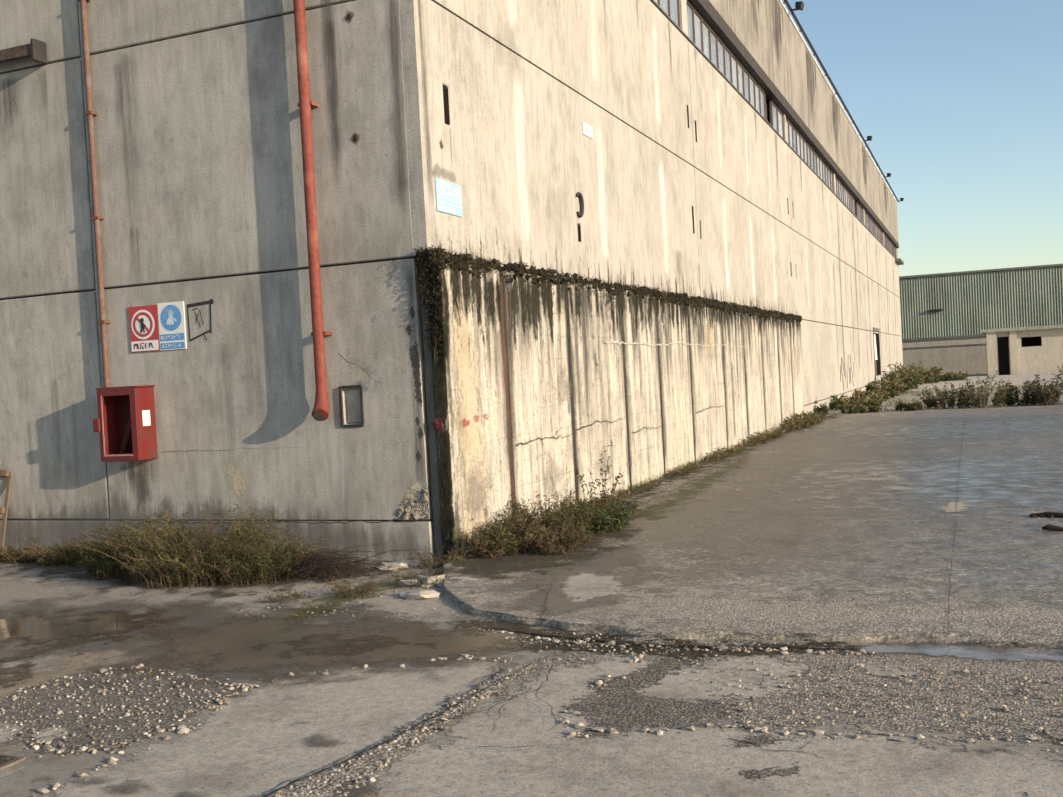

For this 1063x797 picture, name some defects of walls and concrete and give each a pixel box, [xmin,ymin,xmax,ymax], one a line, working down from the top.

damp [390,5,400,130]
damp [450,273,491,541]
damp [568,287,589,482]
damp [620,297,671,425]
damp [686,308,798,447]
spalling [396,483,429,520]
spalling [25,672,295,780]
spalling [430,653,512,663]
crack [263,568,861,797]
spalling [553,696,624,738]
spalling [483,630,874,666]
spalling [642,723,861,739]